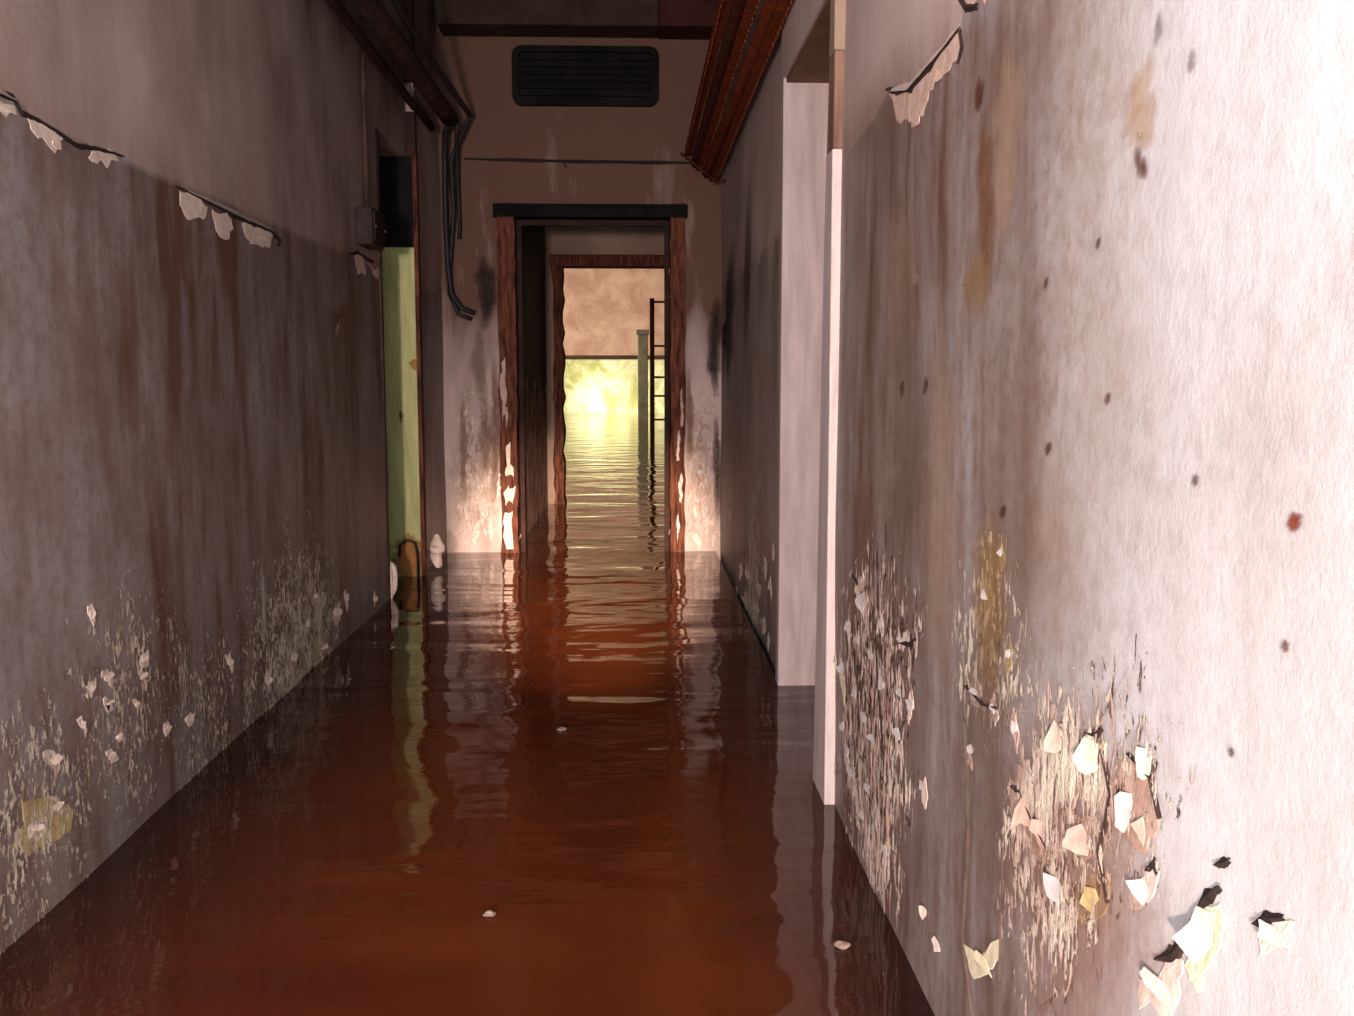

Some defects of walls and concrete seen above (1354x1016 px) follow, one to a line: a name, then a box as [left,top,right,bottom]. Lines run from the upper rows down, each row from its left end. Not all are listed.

peeling [0,88,125,168]
peeling [885,0,986,128]
peeling [176,186,282,248]
peeling [0,507,349,954]
peeling [833,498,928,920]
peeling [952,531,1194,1016]
peeling [1213,856,1231,869]
peeling [1138,885,1226,1016]
peeling [1251,910,1295,957]